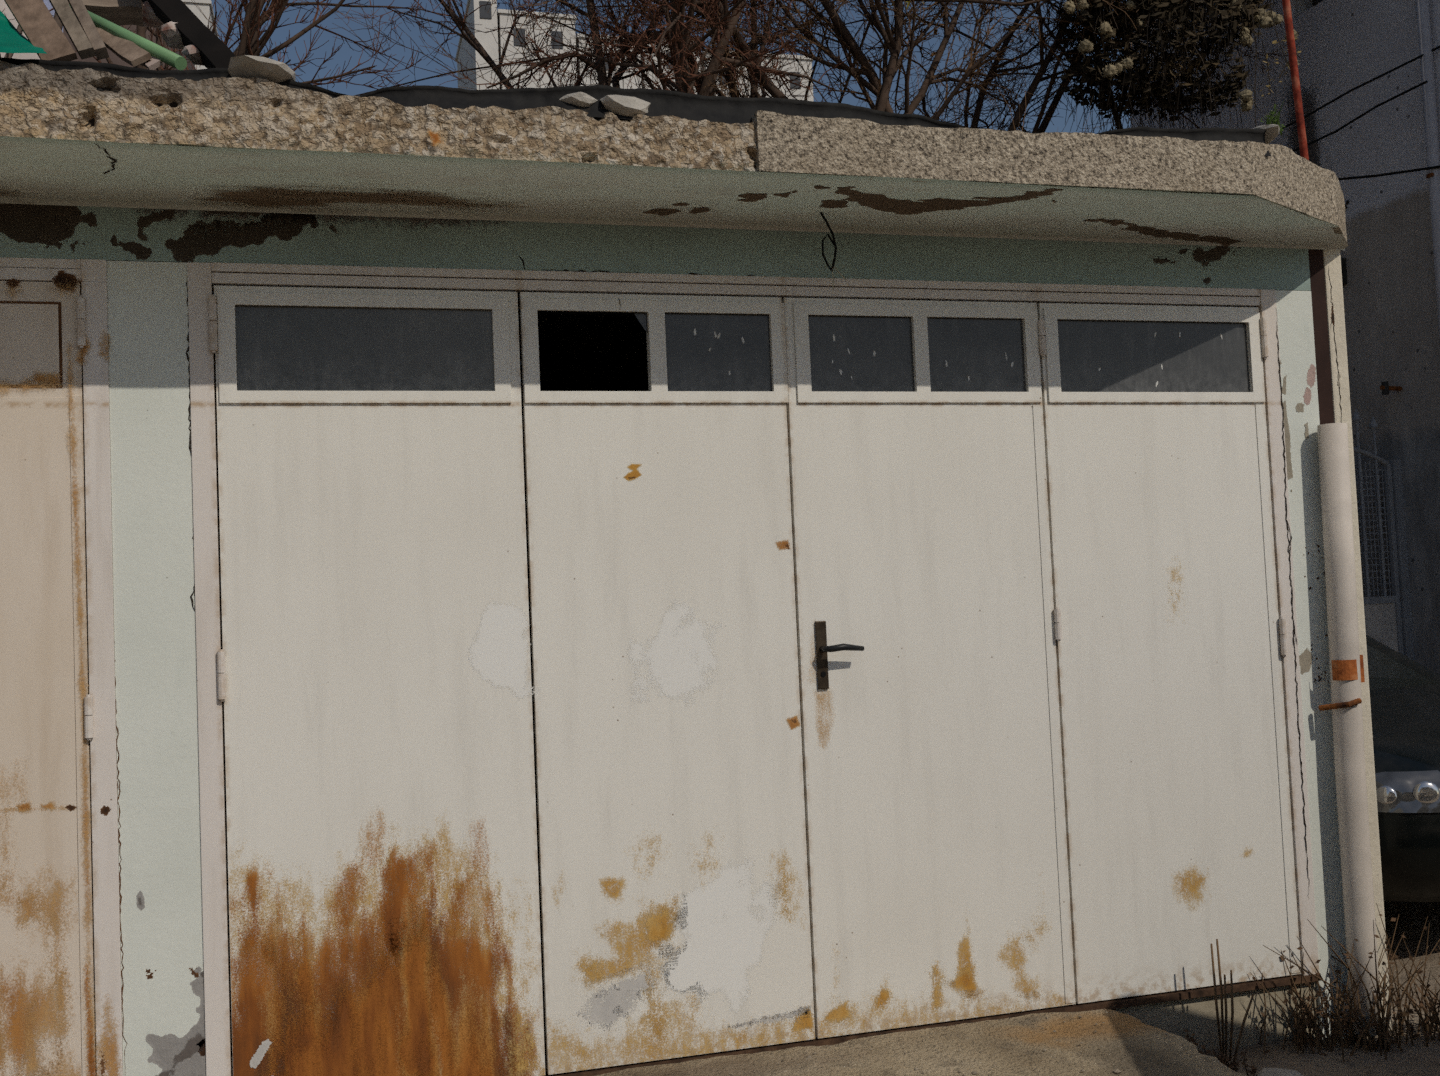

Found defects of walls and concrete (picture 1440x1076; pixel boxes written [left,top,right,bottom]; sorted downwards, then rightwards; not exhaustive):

flaking render [0,203,97,252]
flaking render [110,209,505,263]
flaking render [643,203,711,216]
flaking render [737,186,1063,215]
flaking render [1084,218,1241,284]
corrosion [0,332,119,1076]
corrosion [1175,866,1205,905]
corrosion [229,813,1066,1076]
flaking render [145,966,206,1076]
peeling [578,973,649,1031]